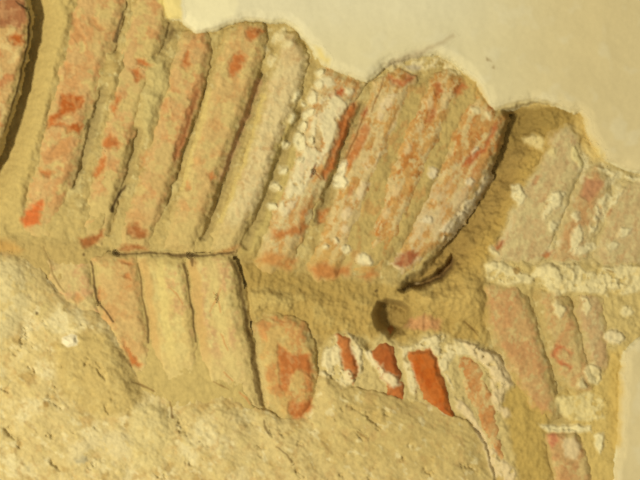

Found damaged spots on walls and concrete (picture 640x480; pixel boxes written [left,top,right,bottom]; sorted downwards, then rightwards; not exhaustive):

crack [88,259,116,324]
flaking render [0,0,235,291]
flaking render [118,337,255,409]
crack [111,248,295,465]
flaking render [194,23,640,480]